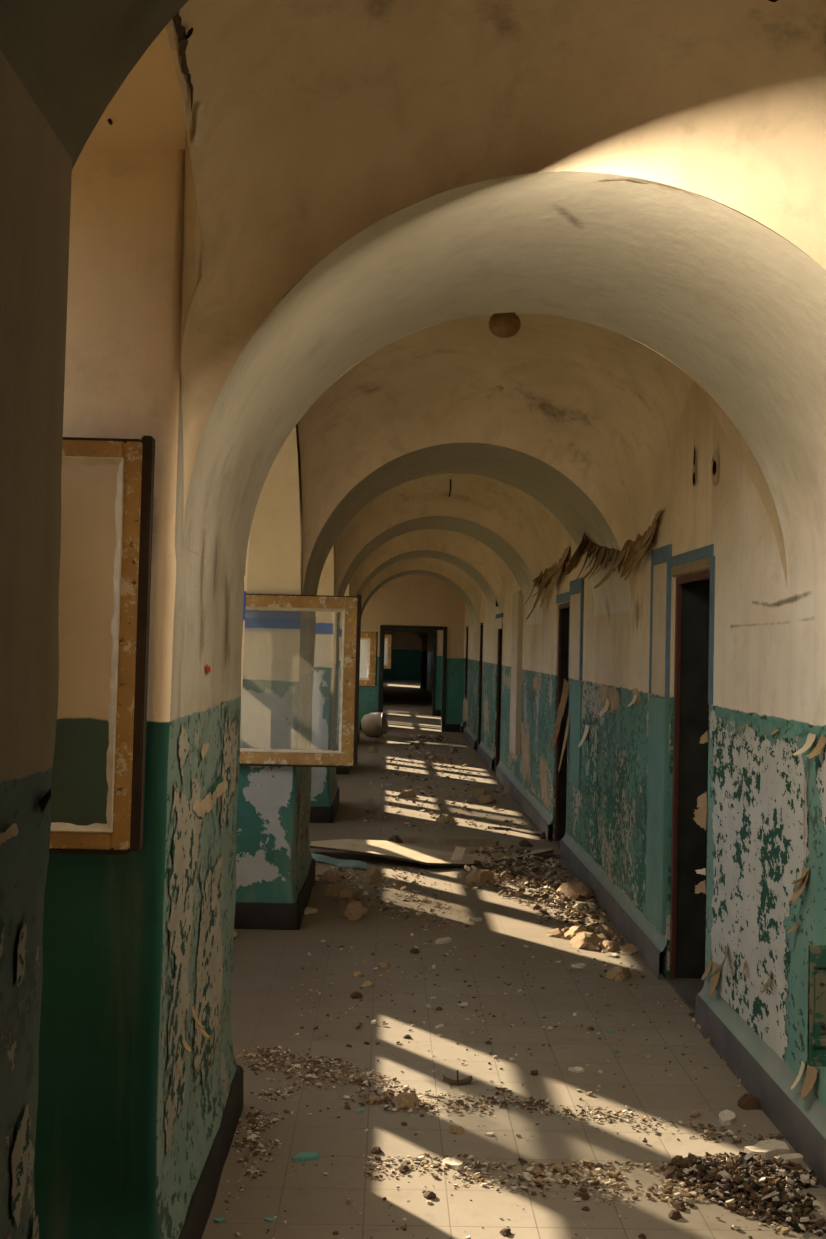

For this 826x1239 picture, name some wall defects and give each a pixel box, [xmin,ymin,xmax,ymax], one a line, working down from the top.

crack [173,10,208,147]
flaking render [524,509,662,622]
peeling [311,667,341,750]
peeling [310,767,327,801]
peeling [509,679,647,913]
peeling [693,709,826,1063]
peeling [790,1061,818,1101]